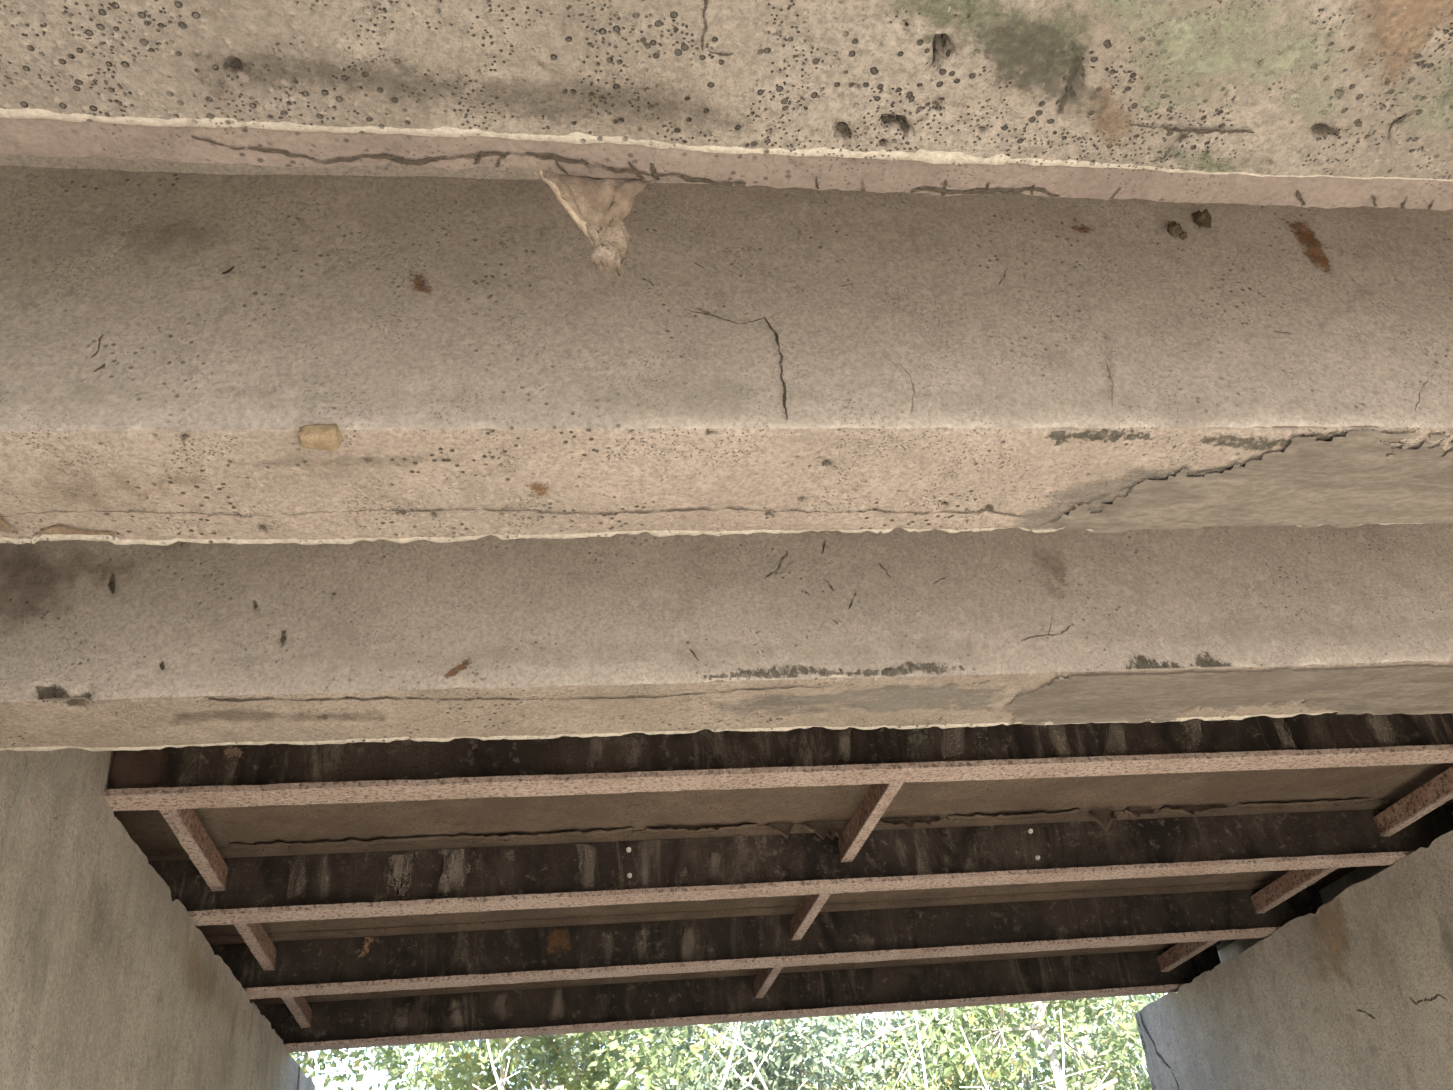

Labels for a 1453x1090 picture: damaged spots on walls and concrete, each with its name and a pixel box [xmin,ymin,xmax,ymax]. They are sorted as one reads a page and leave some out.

flaking render [537,170,654,277]
rust [1289,221,1330,272]
crack [685,308,788,420]
crack [1409,994,1447,1005]